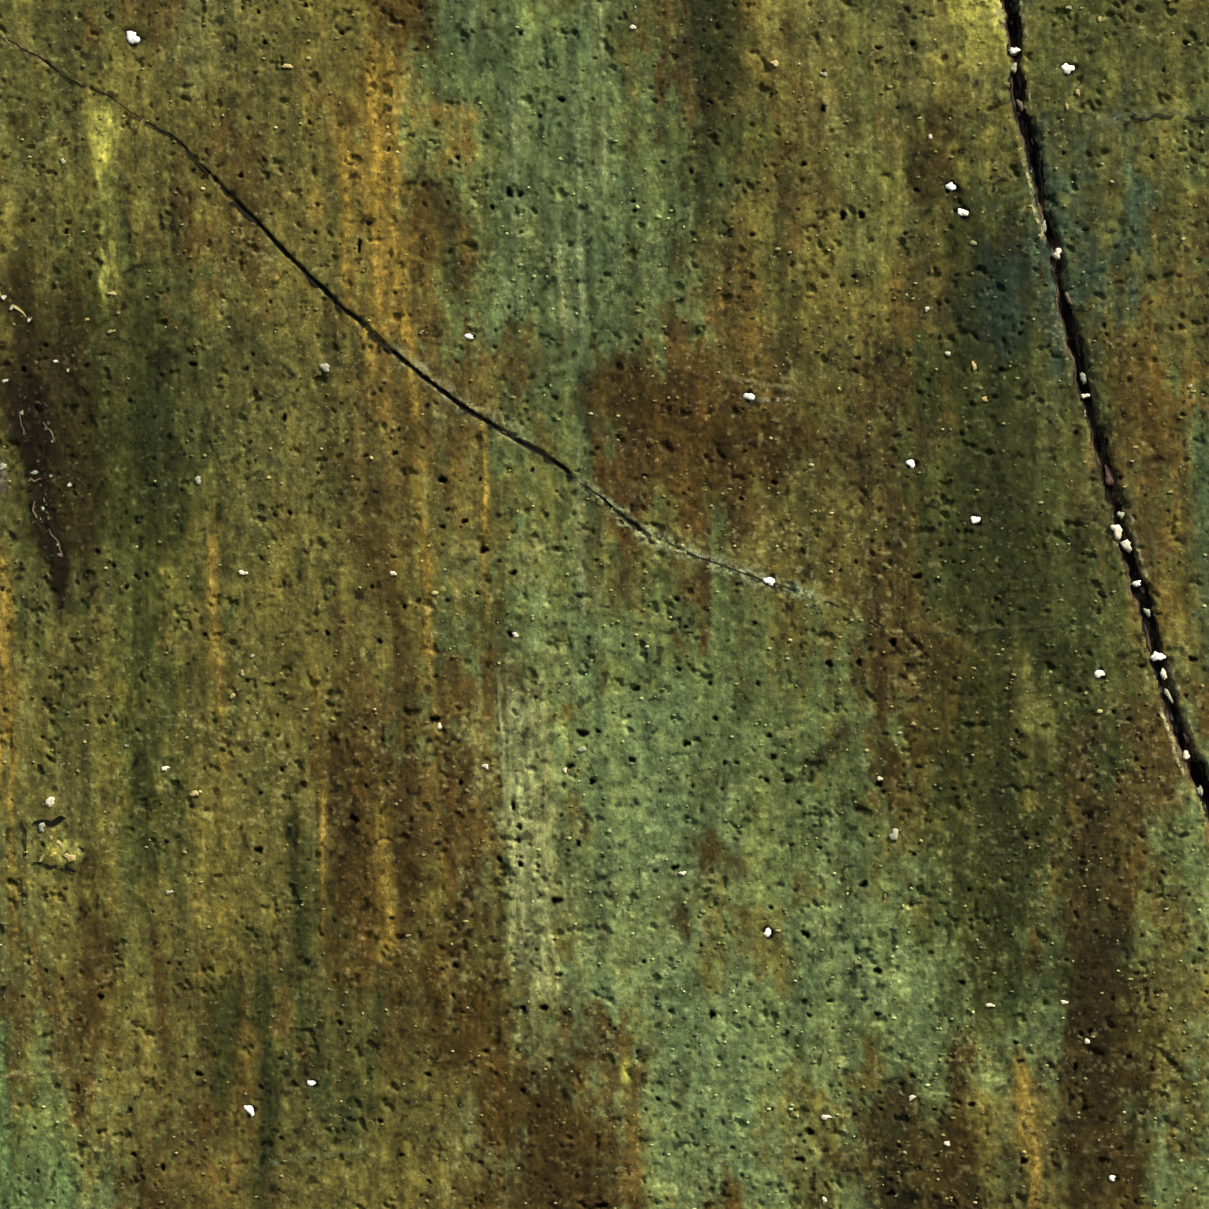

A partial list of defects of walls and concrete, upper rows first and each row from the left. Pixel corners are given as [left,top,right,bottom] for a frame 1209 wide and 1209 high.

leakage [1,166,206,873]
corrosion [206,532,224,716]
crack [2,35,840,608]
corrosion [418,488,436,713]
corrosion [584,365,818,505]
leakage [909,102,1152,1209]
crack [995,0,1209,823]
corrosion [427,962,615,1209]
leakage [844,1057,981,1209]